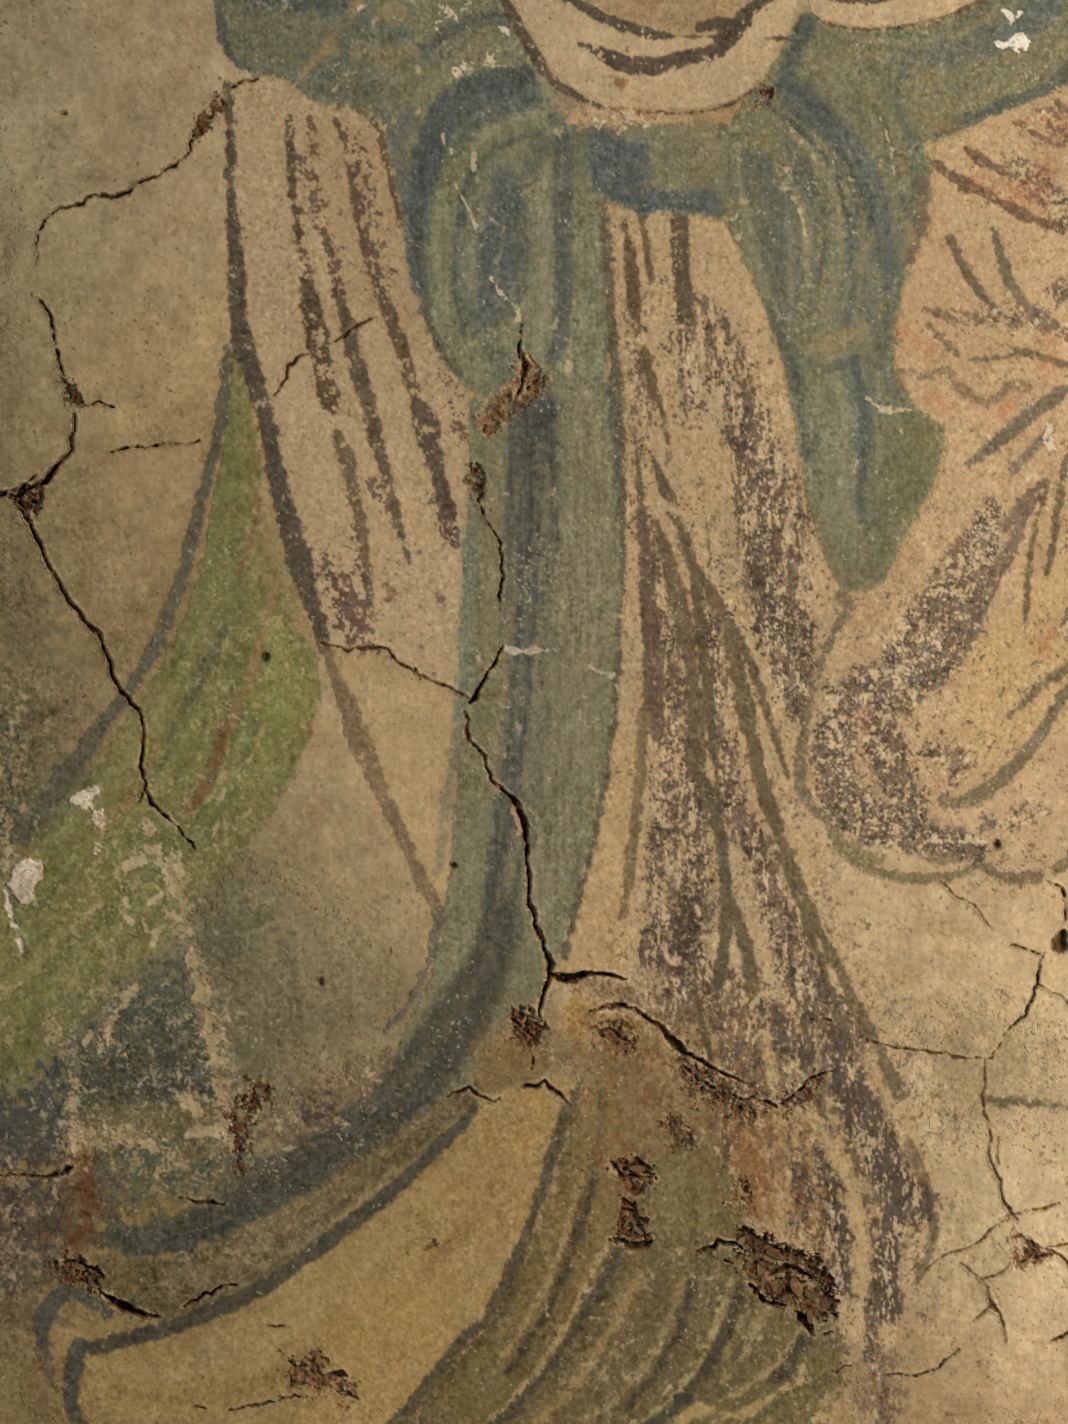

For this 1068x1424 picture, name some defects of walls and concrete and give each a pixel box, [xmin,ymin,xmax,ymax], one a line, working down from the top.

crack [216,76,260,100]
peeling [995,8,1031,56]
spalling [473,348,553,441]
crack [516,323,524,360]
crack [0,140,202,852]
peeling [0,805,45,953]
crack [318,504,835,1109]
peeling [46,752,281,1178]
spalling [602,1153,661,1253]
spalling [695,1169,848,1339]
crack [830,881,1068,1380]
spalling [276,1340,362,1413]